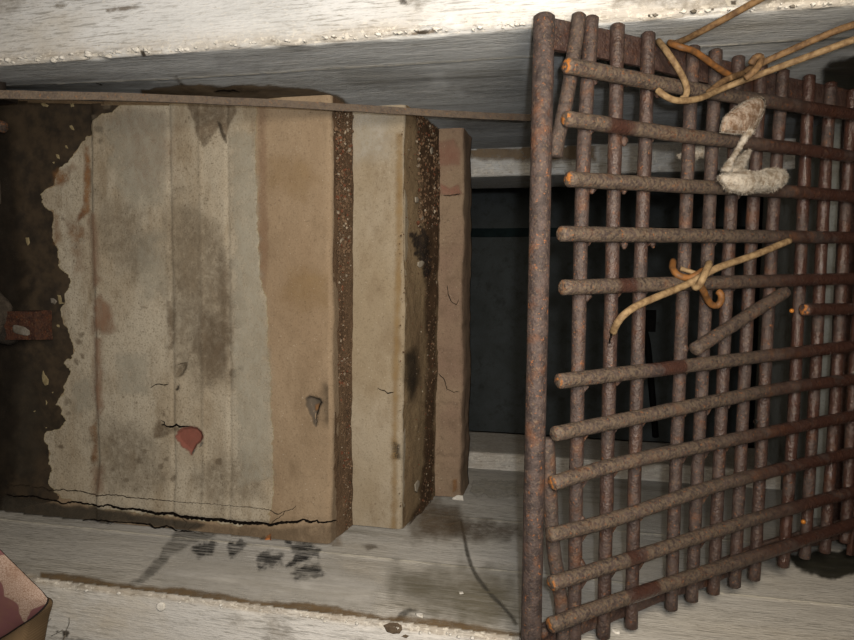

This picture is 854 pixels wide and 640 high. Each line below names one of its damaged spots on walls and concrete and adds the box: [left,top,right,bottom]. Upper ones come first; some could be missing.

spalling [306,396,323,426]
spalling [155,420,204,455]
crack [7,484,337,534]